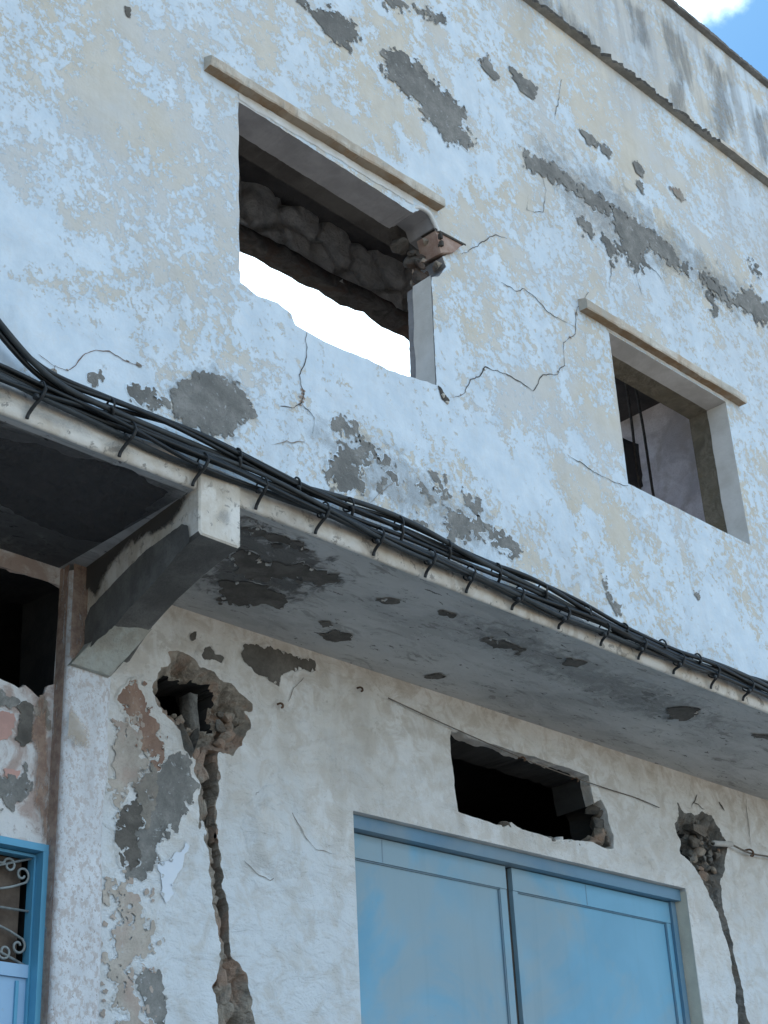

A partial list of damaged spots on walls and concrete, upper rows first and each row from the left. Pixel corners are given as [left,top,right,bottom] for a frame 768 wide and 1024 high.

peeling [379,46,477,153]
peeling [520,146,768,328]
crack [40,350,144,373]
crack [274,335,315,445]
crack [455,282,589,397]
peeling [321,413,524,562]
peeling [214,525,341,610]
peeling [0,689,52,747]
flaking render [239,641,317,690]
peeling [0,762,33,812]
spalling [100,631,255,1024]
crack [691,795,751,843]